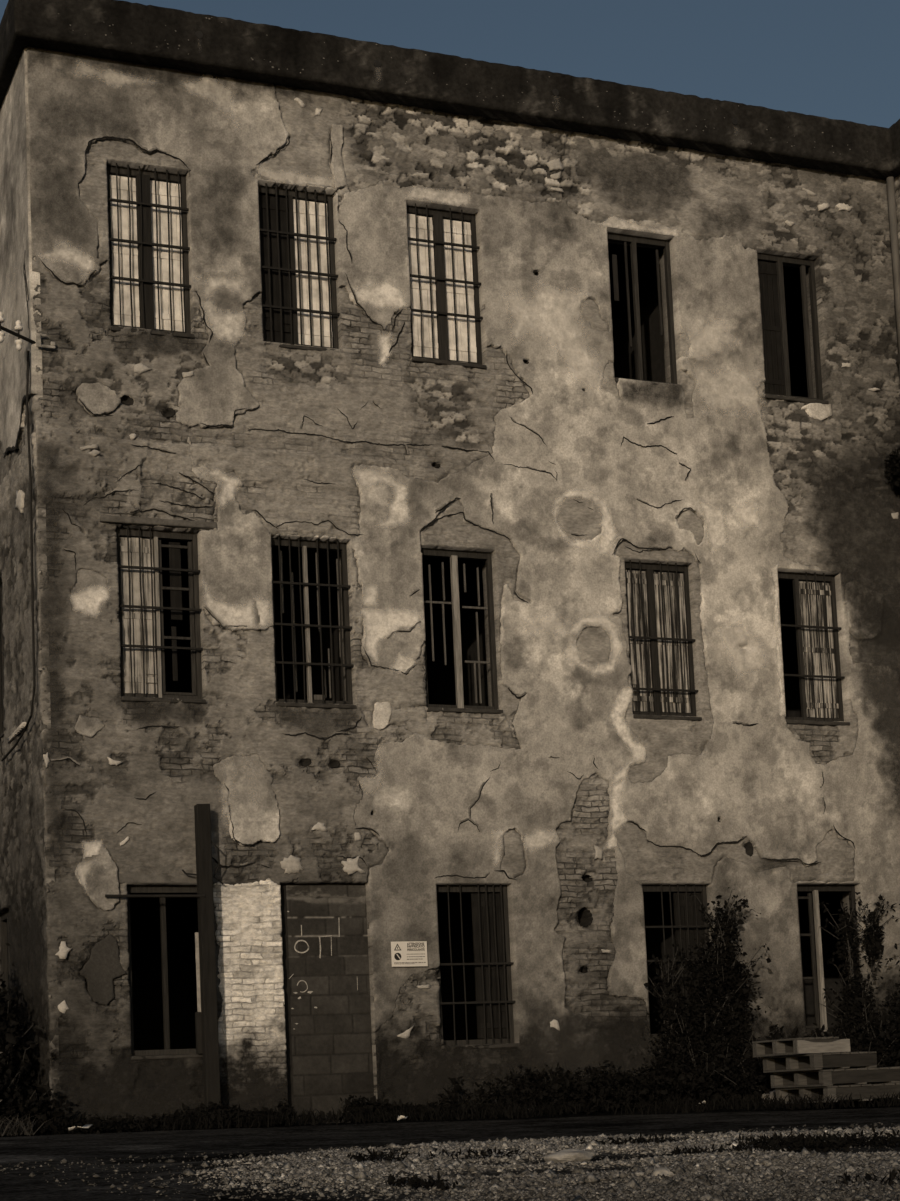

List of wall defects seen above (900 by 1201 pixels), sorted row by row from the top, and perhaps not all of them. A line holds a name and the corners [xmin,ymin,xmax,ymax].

flaking render [251,85,900,594]
crack [201,400,593,540]
crack [612,416,701,564]
flaking render [0,140,531,1118]
flaking render [576,509,714,784]
flaking render [849,606,900,668]
crack [458,762,501,832]
crack [627,820,743,857]
flaking render [550,773,855,1033]
crack [765,857,820,865]
flaking render [784,699,859,765]
crack [820,772,855,848]